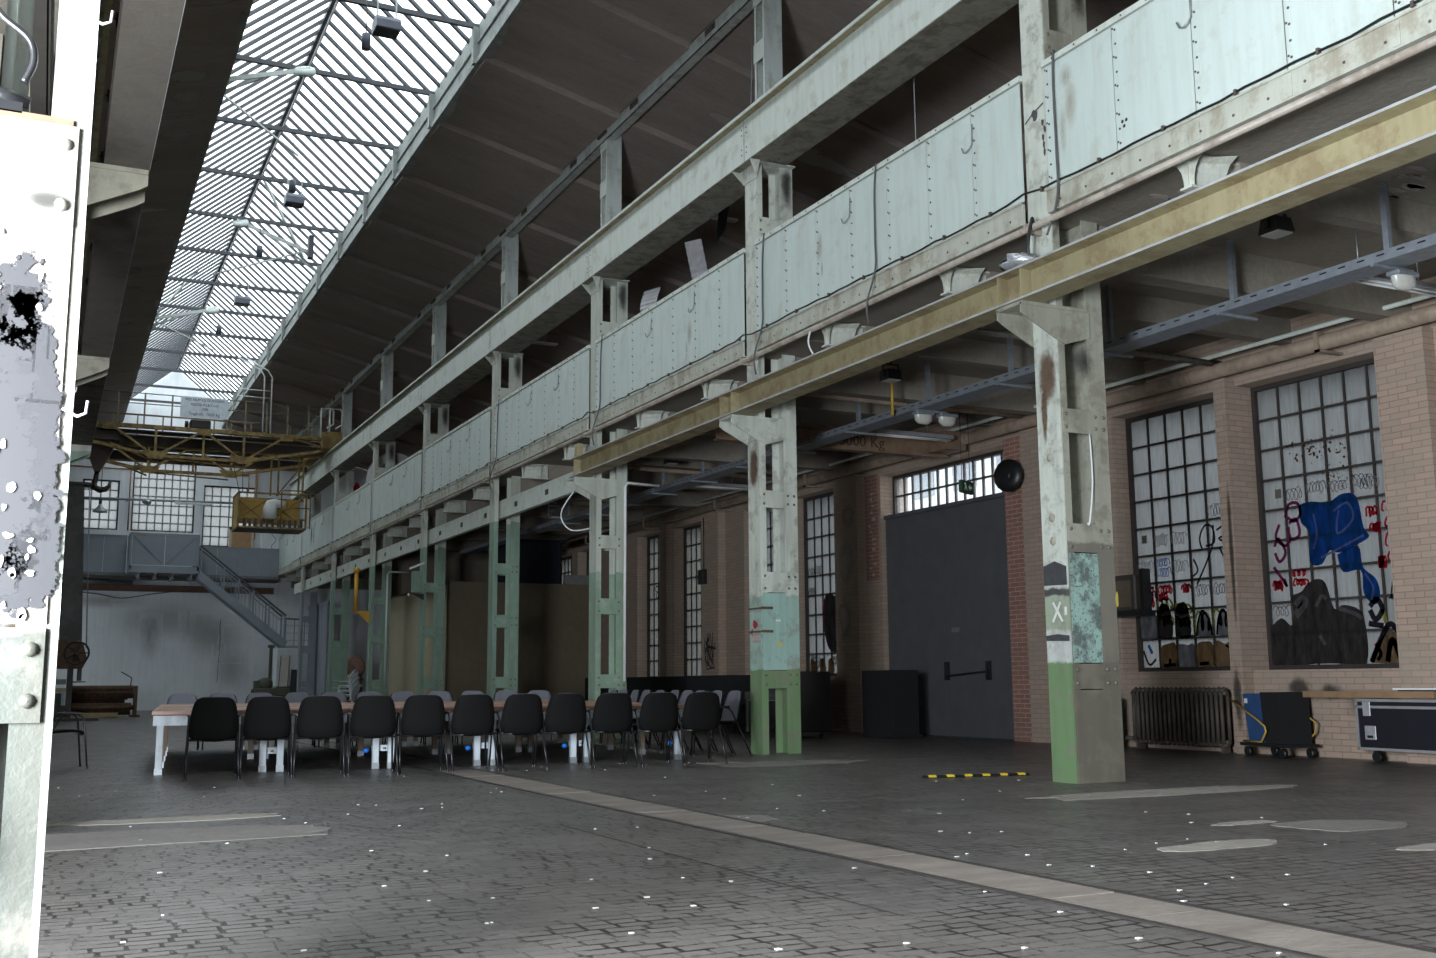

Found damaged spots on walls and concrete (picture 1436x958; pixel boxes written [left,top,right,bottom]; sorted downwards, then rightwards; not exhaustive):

peeling [0,226,67,622]